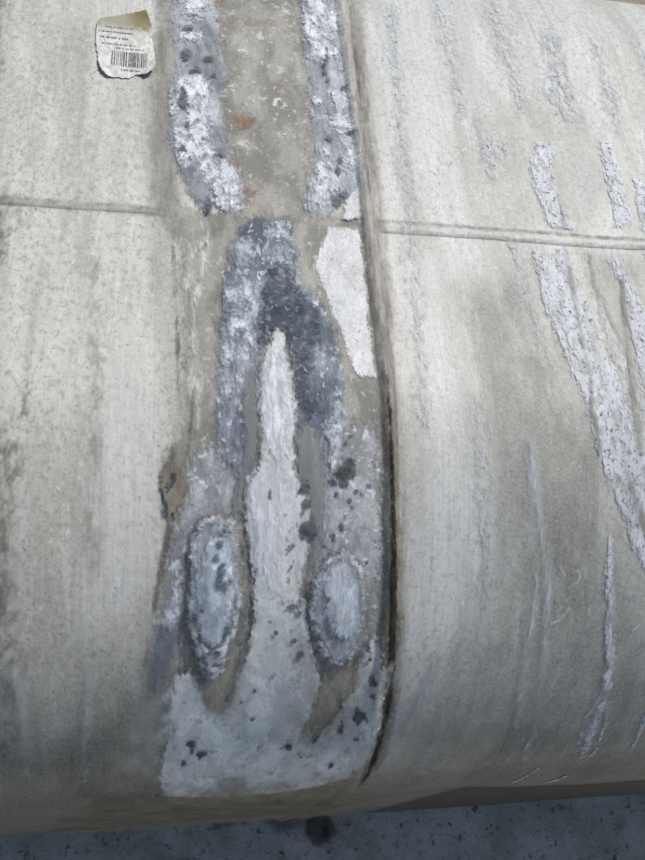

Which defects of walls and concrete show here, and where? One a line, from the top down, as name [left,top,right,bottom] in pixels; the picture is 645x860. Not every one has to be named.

peeling [184,218,212,428]
peeling [312,190,377,378]
damp [530,141,575,230]
damp [518,246,645,567]
damp [600,139,645,231]
peeling [155,328,386,798]
crack [359,363,404,787]
damp [577,536,616,757]